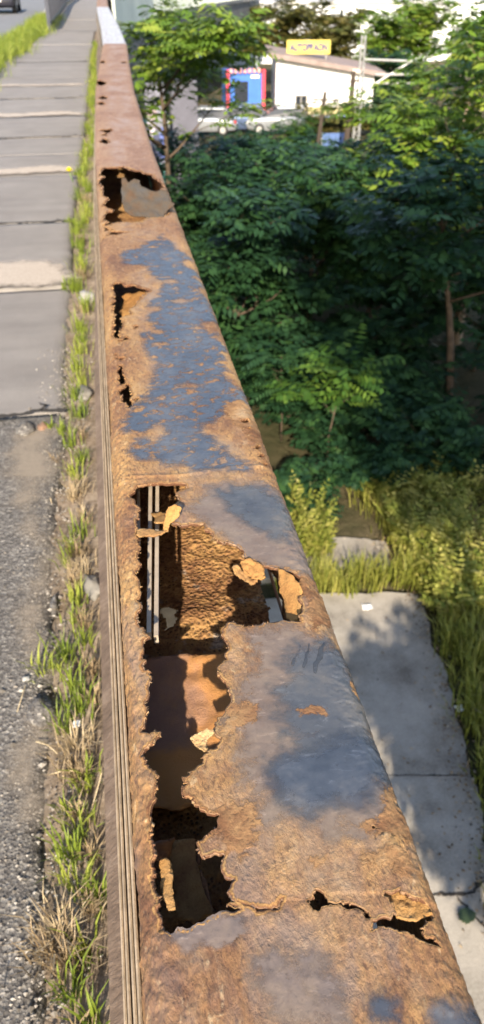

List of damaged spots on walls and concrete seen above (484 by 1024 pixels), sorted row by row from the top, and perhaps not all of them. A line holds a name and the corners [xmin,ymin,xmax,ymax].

peeling [121,234,269,471]
corrosion [224,399,272,468]
peeling [215,486,293,544]
spalling [267,569,284,620]
corrosion [187,480,428,882]
corrosion [168,911,247,953]
crack [306,887,373,919]
corrosion [384,892,432,922]